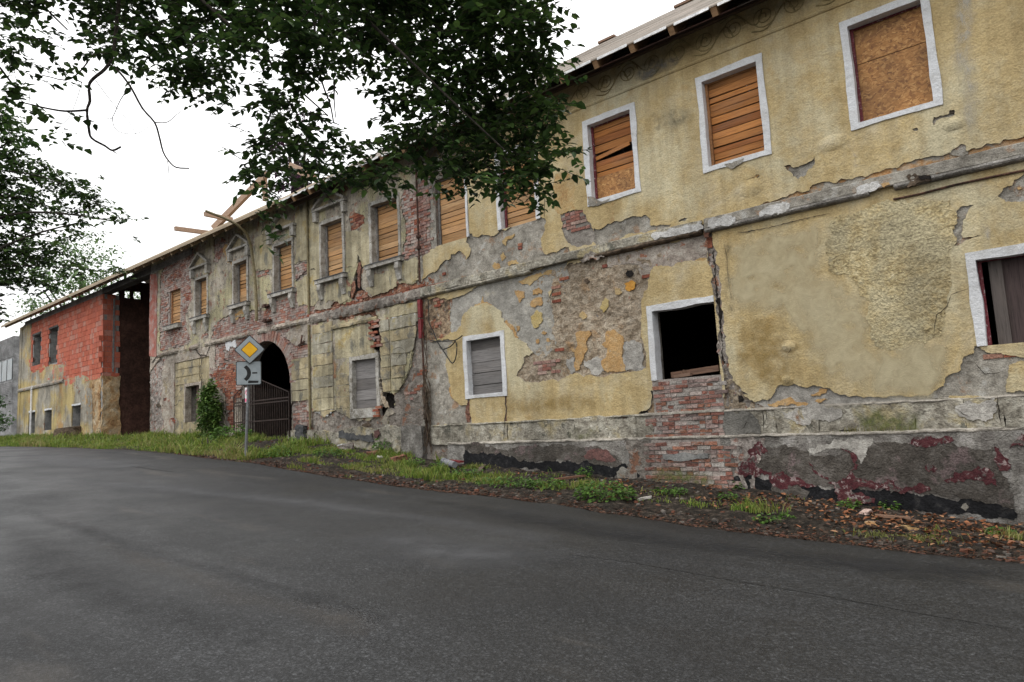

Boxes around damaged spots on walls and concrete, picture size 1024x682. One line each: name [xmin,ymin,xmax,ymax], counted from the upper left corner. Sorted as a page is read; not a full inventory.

peeling [759,137,1024,217]
flaking render [953,205,977,246]
crack [351,247,365,299]
peeling [150,141,736,438]
crack [707,214,825,396]
peeling [724,346,1024,409]
peeling [738,441,931,504]
peeling [909,434,954,448]
peeling [925,433,1024,486]